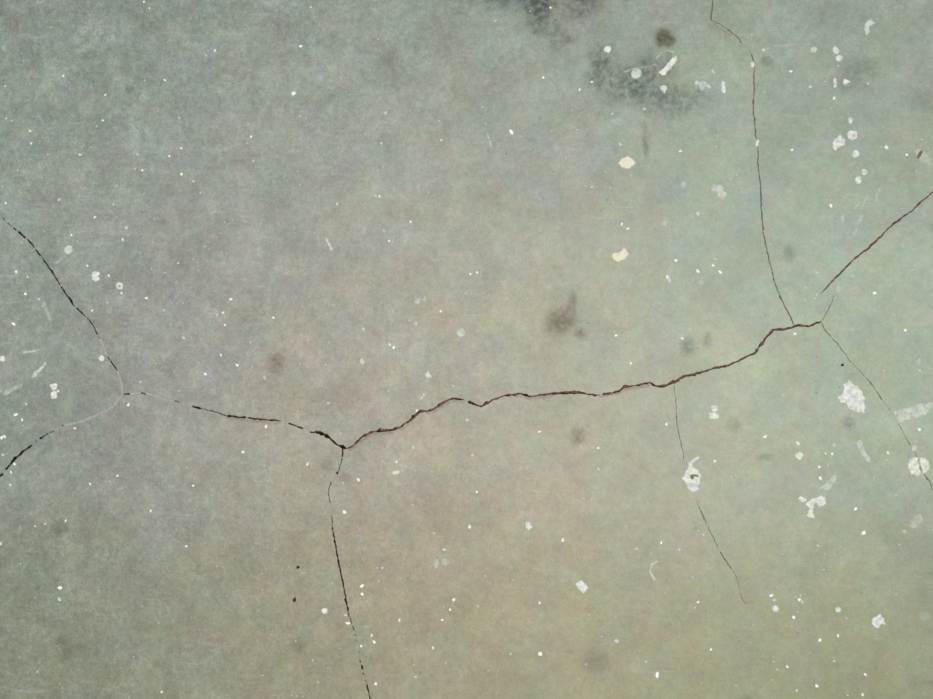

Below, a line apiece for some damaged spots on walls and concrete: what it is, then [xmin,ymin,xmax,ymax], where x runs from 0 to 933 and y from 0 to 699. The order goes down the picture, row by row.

crack [710,1,757,140]
crack [821,191,933,293]
crack [0,146,892,699]